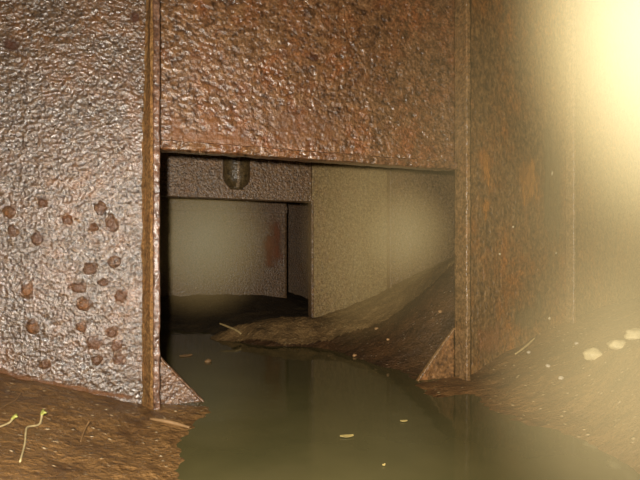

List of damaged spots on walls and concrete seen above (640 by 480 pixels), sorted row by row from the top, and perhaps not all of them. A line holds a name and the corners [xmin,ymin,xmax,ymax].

corrosion [2,206,19,237]
corrosion [89,201,120,232]
corrosion [31,231,44,246]
corrosion [83,262,109,287]
corrosion [107,256,121,268]
corrosion [19,283,33,299]
corrosion [67,282,94,311]
corrosion [114,289,127,303]
corrosion [25,318,40,335]
corrosion [76,321,127,366]